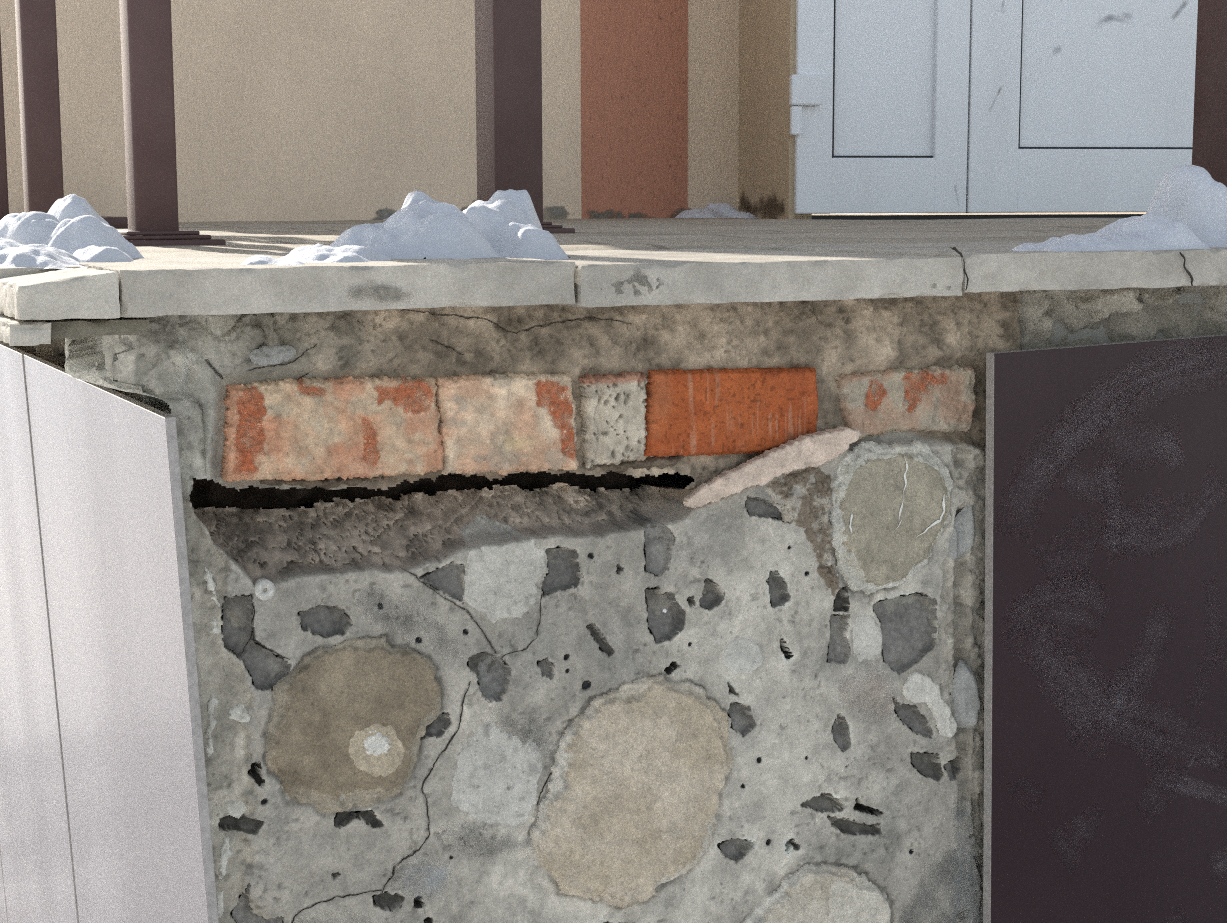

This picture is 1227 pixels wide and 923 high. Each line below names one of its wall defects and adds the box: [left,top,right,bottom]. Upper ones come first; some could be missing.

crack [950,247,969,291]
crack [1180,252,1194,286]
crack [407,571,543,658]
spalling [626,510,725,644]
peeling [683,426,861,664]
spalling [873,593,938,675]
spalling [831,713,851,767]
spalling [893,698,961,781]
spalling [219,814,263,834]
spalling [334,810,383,829]
crack [292,681,471,923]
spalling [801,793,883,836]